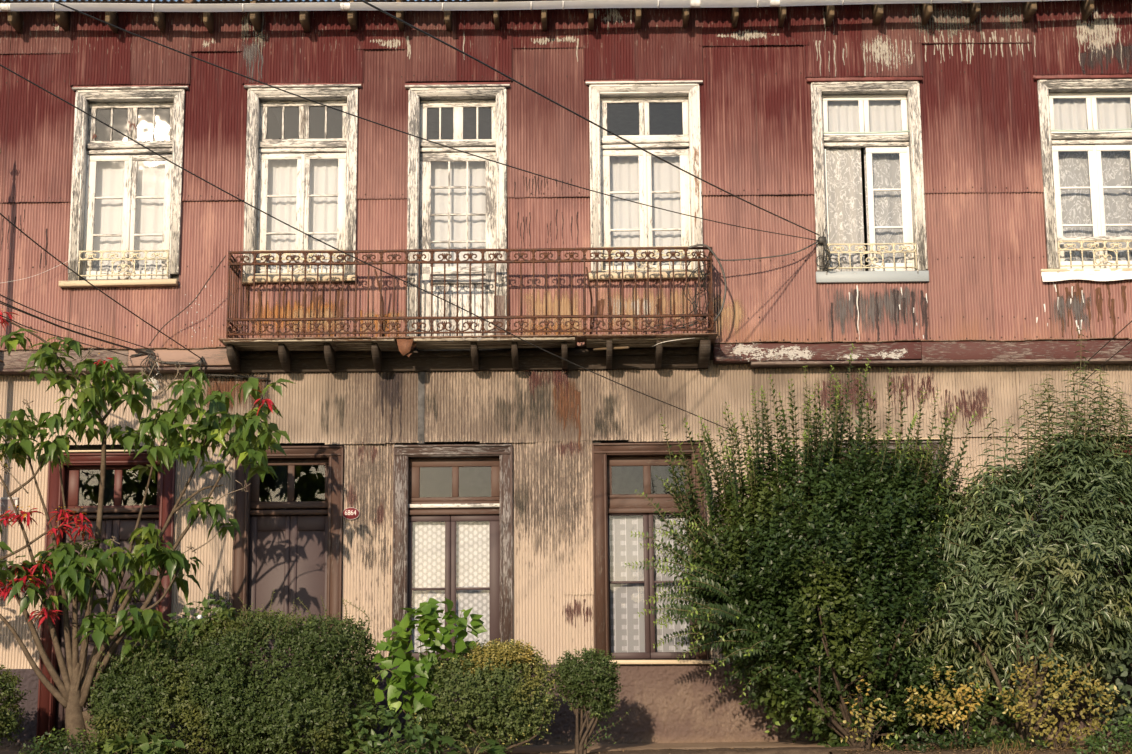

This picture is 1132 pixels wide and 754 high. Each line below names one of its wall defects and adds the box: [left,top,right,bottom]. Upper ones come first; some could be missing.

peeling [815,3,1036,76]
peeling [1076,10,1123,67]
corrosion [524,288,690,335]
peeling [720,342,815,362]
leakage [321,396,344,432]
leakage [379,372,402,446]
leakage [495,381,551,432]
leakage [595,396,617,437]